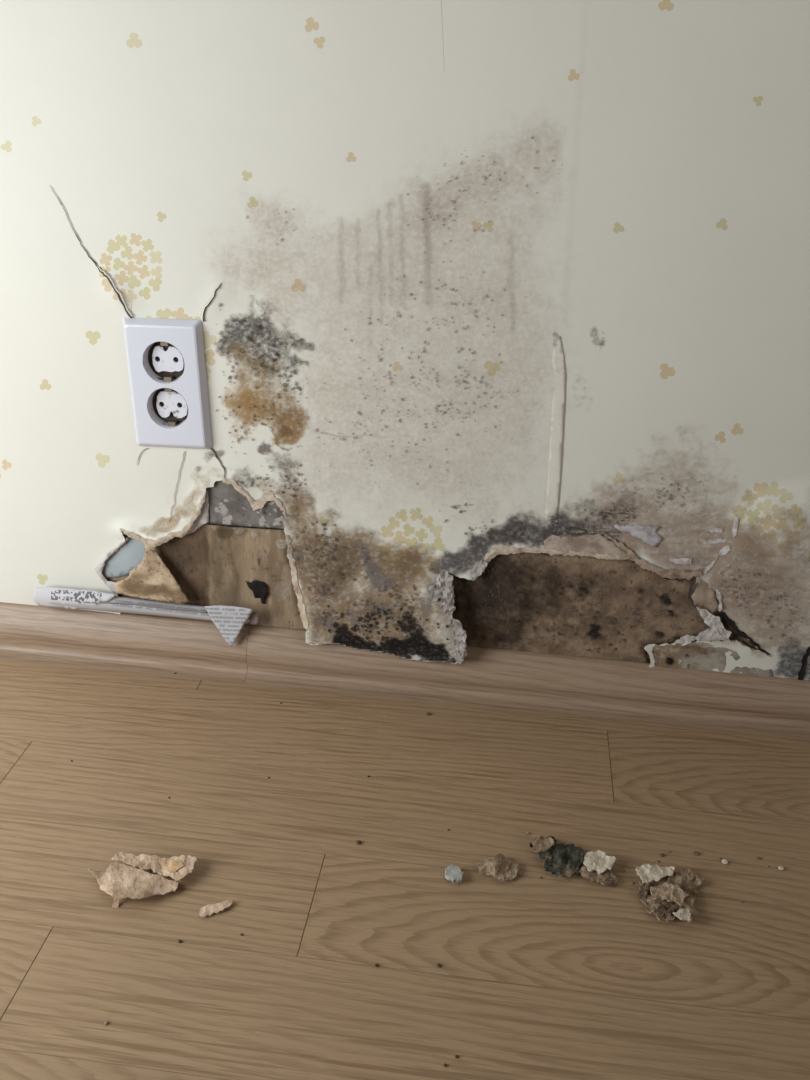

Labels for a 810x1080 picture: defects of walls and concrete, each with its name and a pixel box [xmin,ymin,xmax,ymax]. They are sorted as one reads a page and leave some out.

crack [51,188,134,318]
leakage [144,492,195,535]
peeling [95,477,309,640]
leakage [209,304,810,681]
peeling [426,531,773,677]